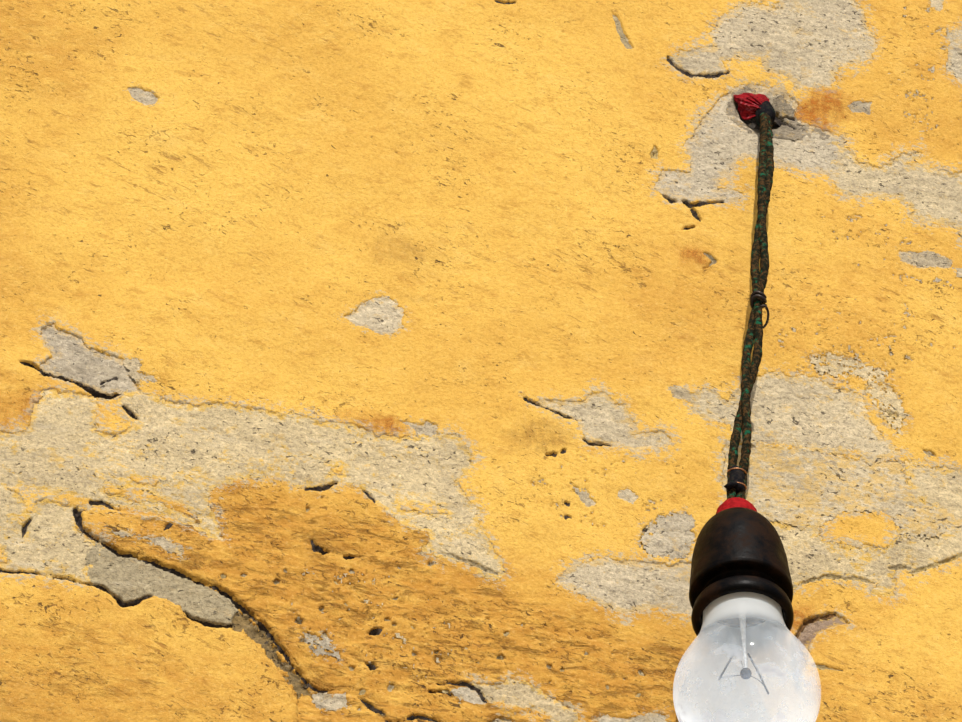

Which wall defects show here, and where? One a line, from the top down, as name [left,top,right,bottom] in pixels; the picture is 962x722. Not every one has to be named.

peeling [653,0,962,236]
peeling [344,296,404,335]
peeling [535,392,671,457]
peeling [0,324,506,629]
crack [22,519,32,538]
crack [0,570,153,608]
crack [73,501,328,693]
peeling [556,489,696,615]
crack [793,553,962,588]
peeling [312,692,360,713]
crack [360,699,438,722]
peeling [442,678,579,722]